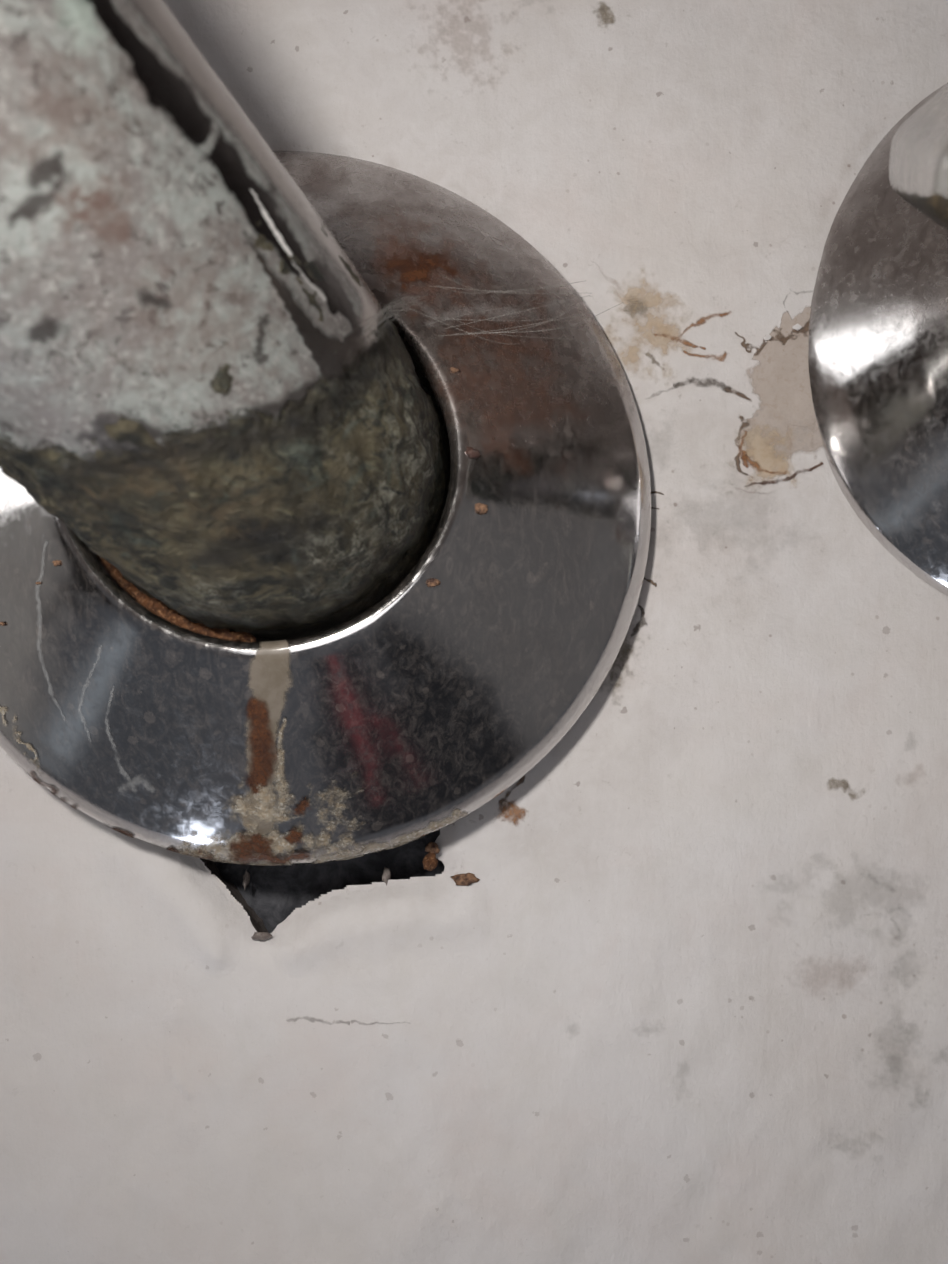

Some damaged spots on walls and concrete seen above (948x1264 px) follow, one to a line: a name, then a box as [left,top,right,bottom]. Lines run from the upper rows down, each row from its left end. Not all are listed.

crack [673,379,750,400]
peeling [735,307,823,475]
flaking render [200,829,480,941]